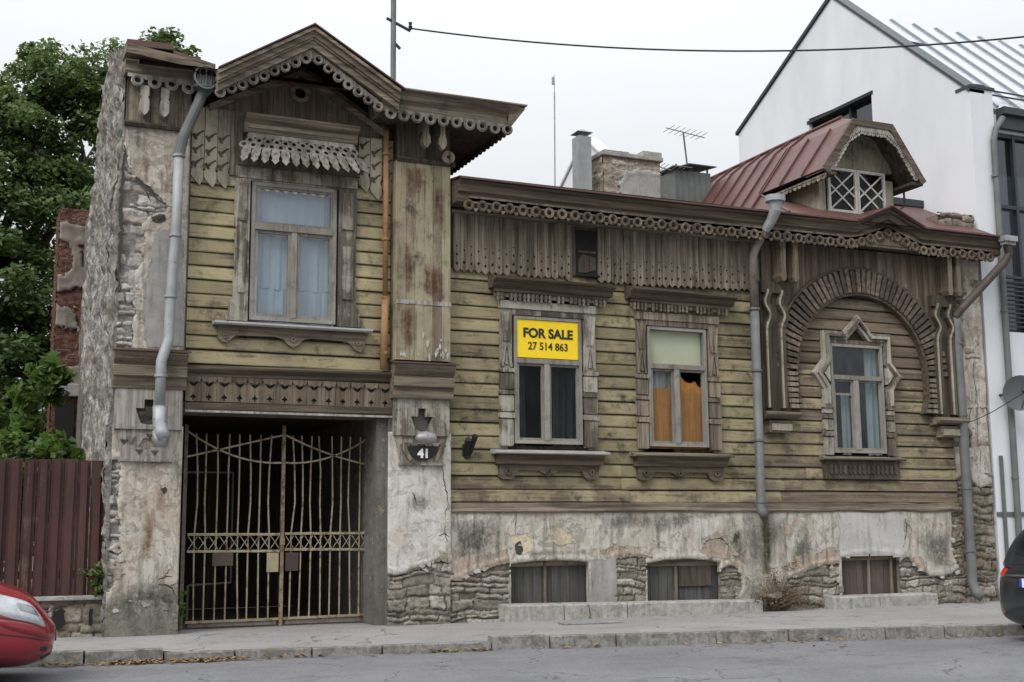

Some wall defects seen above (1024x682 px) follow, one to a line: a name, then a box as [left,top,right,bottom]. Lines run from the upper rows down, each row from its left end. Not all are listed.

spalling [937,212,975,228]
spalling [116,160,172,347]
spalling [954,405,990,463]
spalling [898,469,999,604]
spalling [387,532,533,626]
spalling [600,542,653,602]
peeling [701,538,747,600]
spalling [784,547,844,609]